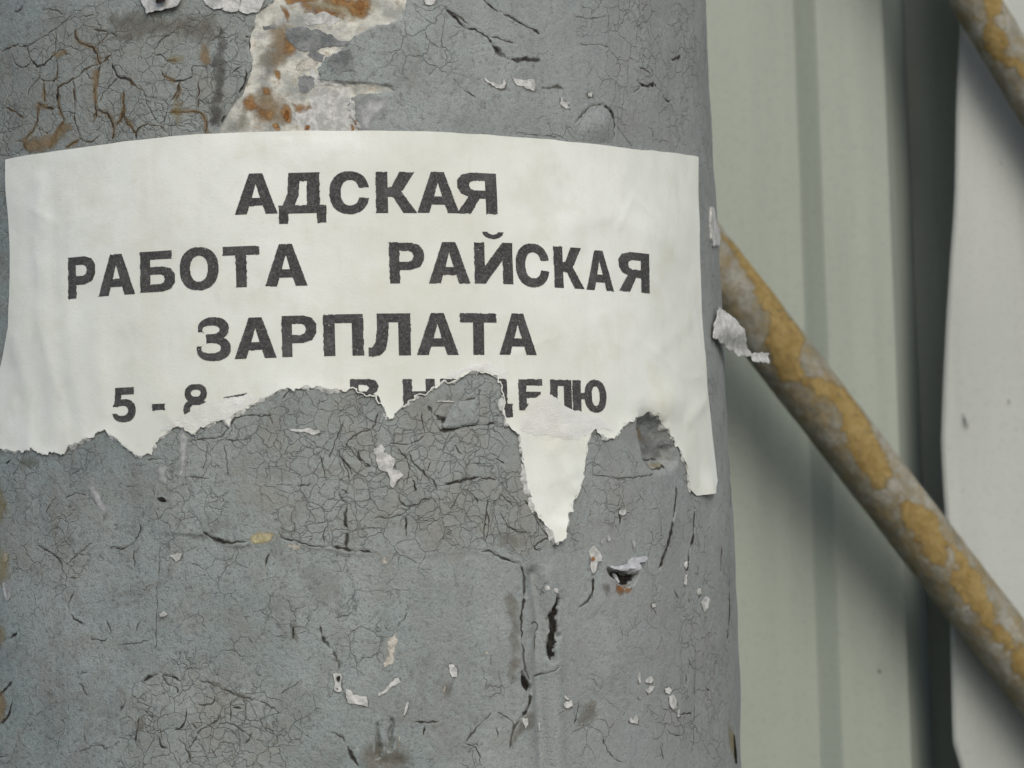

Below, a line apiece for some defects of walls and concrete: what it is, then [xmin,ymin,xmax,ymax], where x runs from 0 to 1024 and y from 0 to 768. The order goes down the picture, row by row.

crack [3,5,226,150]
crack [212,27,251,92]
peeling [204,0,407,133]
crack [446,0,540,62]
peeling [484,77,536,91]
crack [193,391,289,479]
crack [38,523,149,645]
crack [203,532,246,544]
crack [265,389,557,761]
spalling [588,535,648,593]
crack [121,674,300,761]
crack [337,734,359,766]